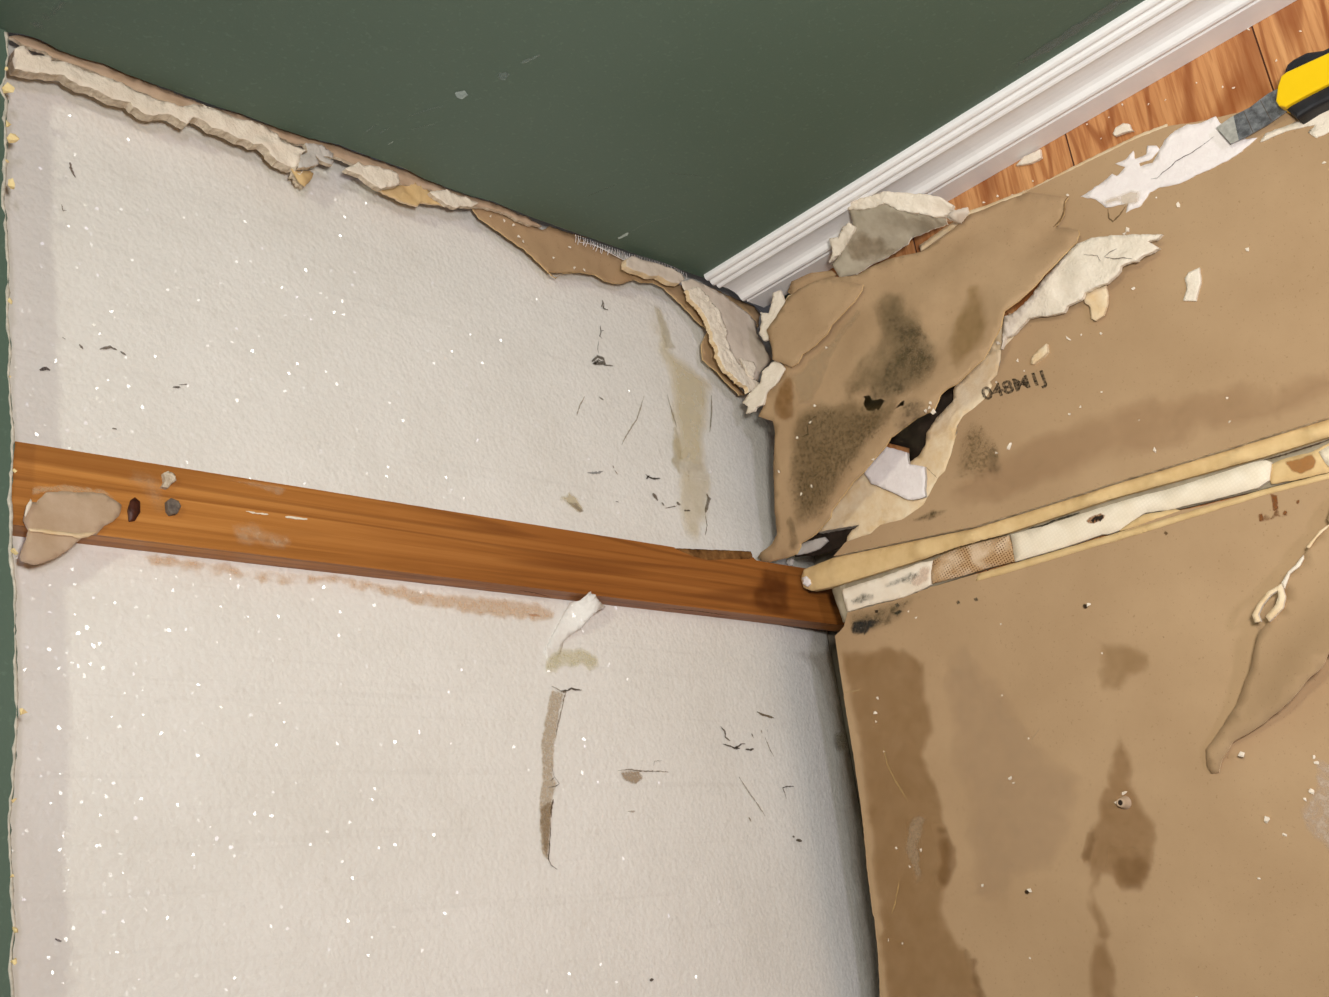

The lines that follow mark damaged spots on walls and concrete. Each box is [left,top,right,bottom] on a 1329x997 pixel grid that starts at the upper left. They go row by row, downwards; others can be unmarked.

spalling [296,143,400,192]
spalling [427,189,478,210]
spalling [540,686,580,869]